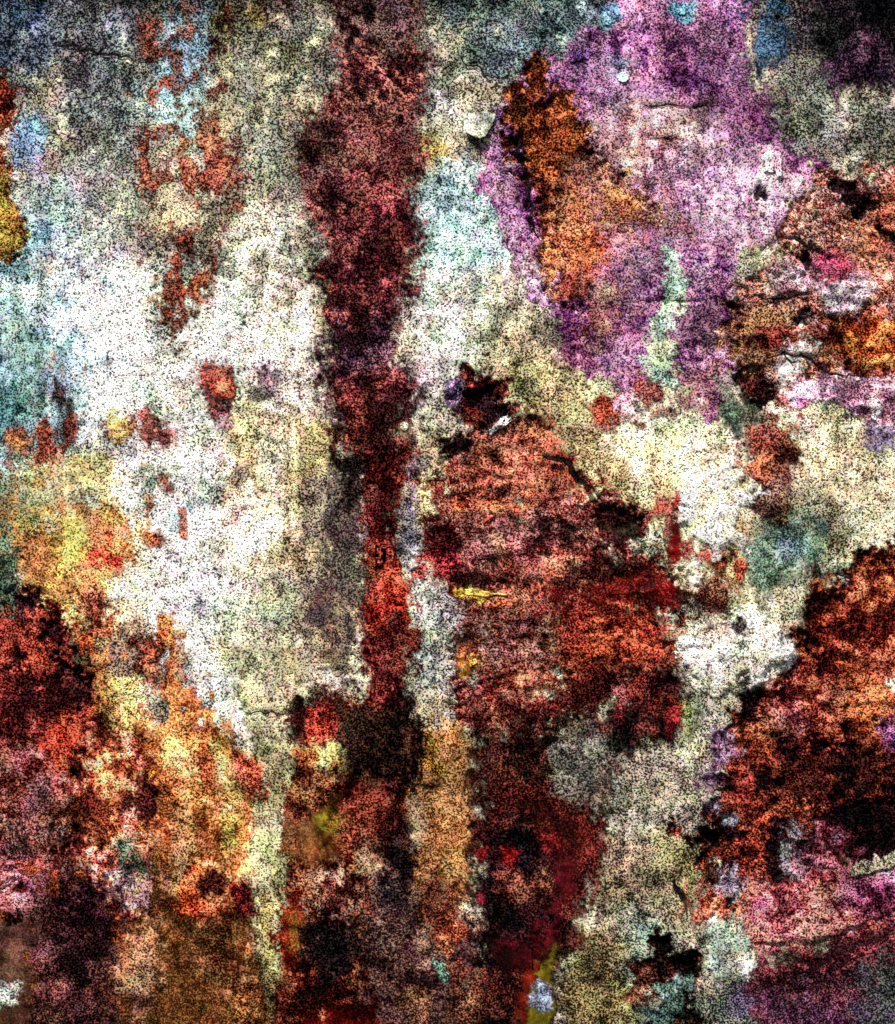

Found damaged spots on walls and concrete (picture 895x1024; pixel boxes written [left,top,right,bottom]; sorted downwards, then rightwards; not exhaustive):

rust [133,2,251,354]
rust [559,154,612,216]
rust [575,259,633,357]
rust [290,0,438,712]
rust [587,369,680,433]
rust [645,489,684,542]
rust [682,538,749,617]
rust [47,471,414,1024]
rust [0,843,44,924]